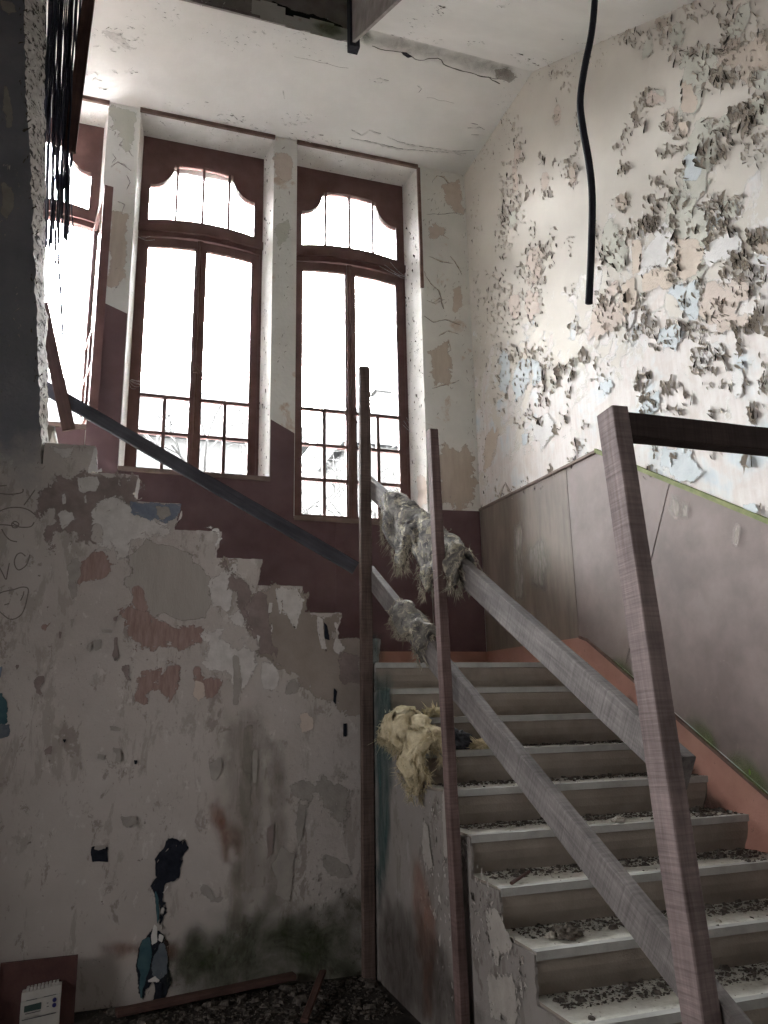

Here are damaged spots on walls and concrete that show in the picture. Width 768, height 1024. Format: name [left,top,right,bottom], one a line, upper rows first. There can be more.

crack [373,46,500,84]
peeling [264,0,768,511]
peeling [34,448,182,599]
peeling [743,503,762,513]
peeling [87,526,360,737]
spalling [136,838,189,1000]
mould [177,905,362,988]
peeling [461,837,527,1024]